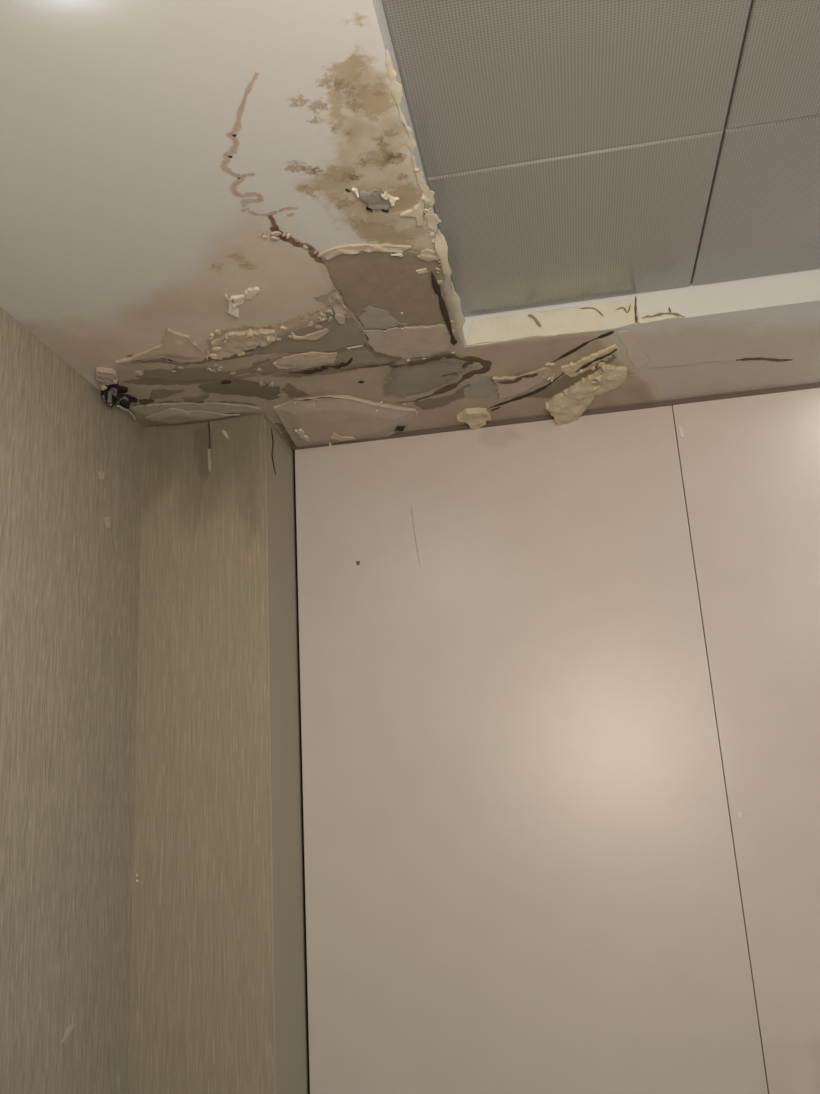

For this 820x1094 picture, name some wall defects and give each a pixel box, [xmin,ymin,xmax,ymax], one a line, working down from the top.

spalling [96,45,685,429]
leakage [0,28,820,447]